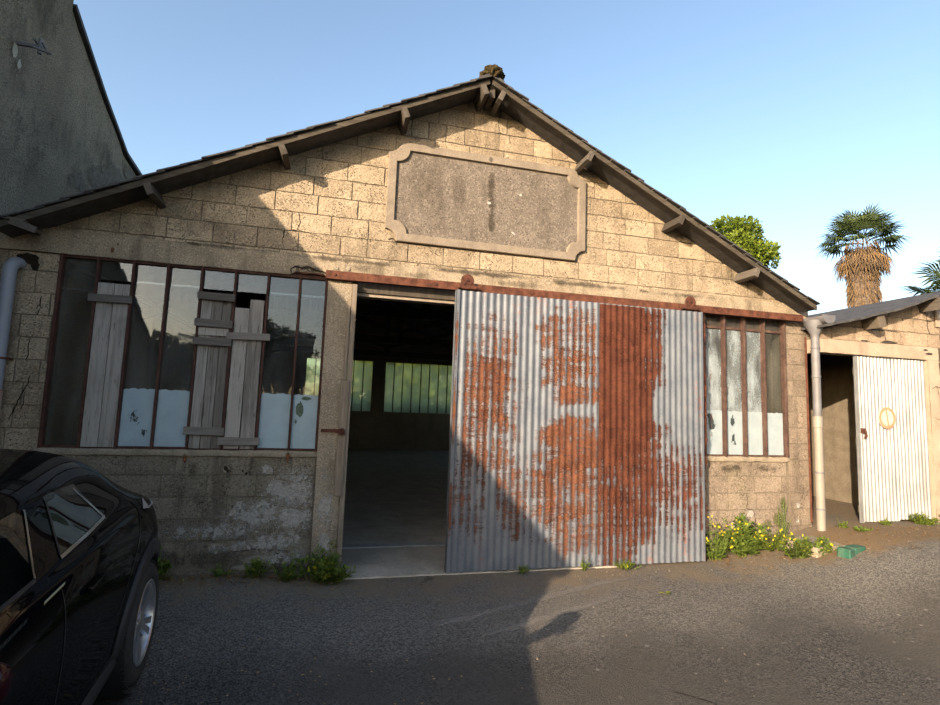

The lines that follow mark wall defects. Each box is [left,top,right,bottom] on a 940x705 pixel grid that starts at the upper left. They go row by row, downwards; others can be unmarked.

peeling [158,464,333,571]
corrosion [448,304,713,567]